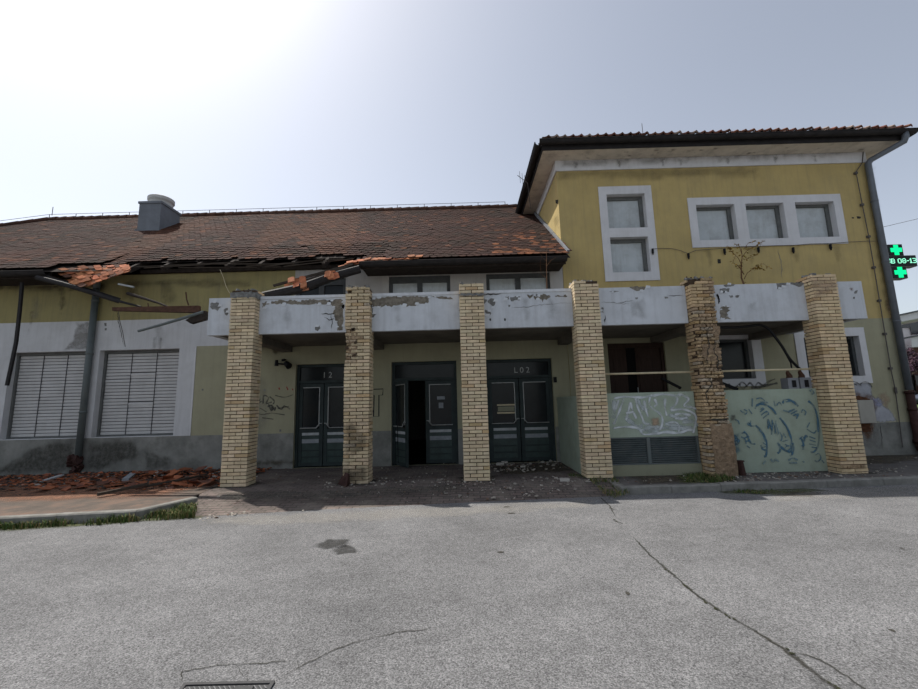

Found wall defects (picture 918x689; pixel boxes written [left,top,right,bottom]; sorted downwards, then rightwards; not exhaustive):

spalling [371,295,453,319]
spalling [484,279,593,321]
spalling [698,283,739,363]
crack [600,497,717,608]
crack [745,625,866,689]